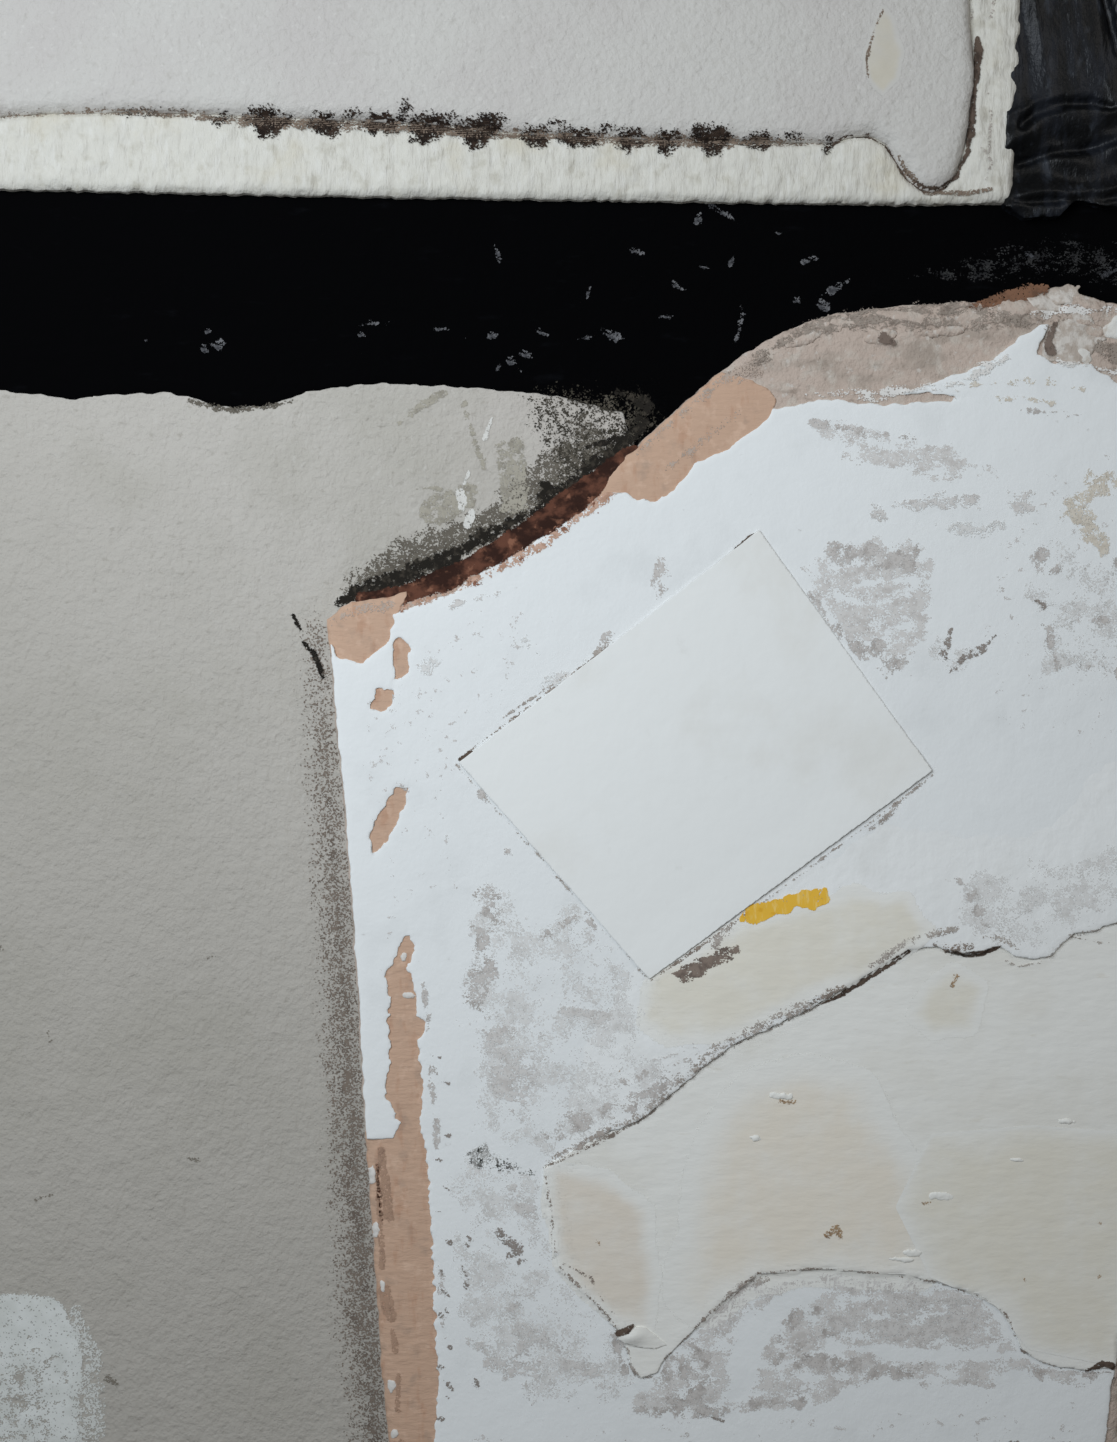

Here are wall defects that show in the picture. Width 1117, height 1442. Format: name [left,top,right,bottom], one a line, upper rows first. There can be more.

peeling [693,204,734,225]
peeling [201,329,226,353]
peeling [577,330,625,343]
spalling [599,241,1117,502]
peeling [397,390,530,529]
peeling [651,557,669,596]
peeling [801,418,1038,679]
peeling [1023,468,1117,680]
peeling [327,592,440,712]
leakage [906,961,988,1041]
peeling [365,884,1104,1442]
leakage [540,1052,1117,1364]